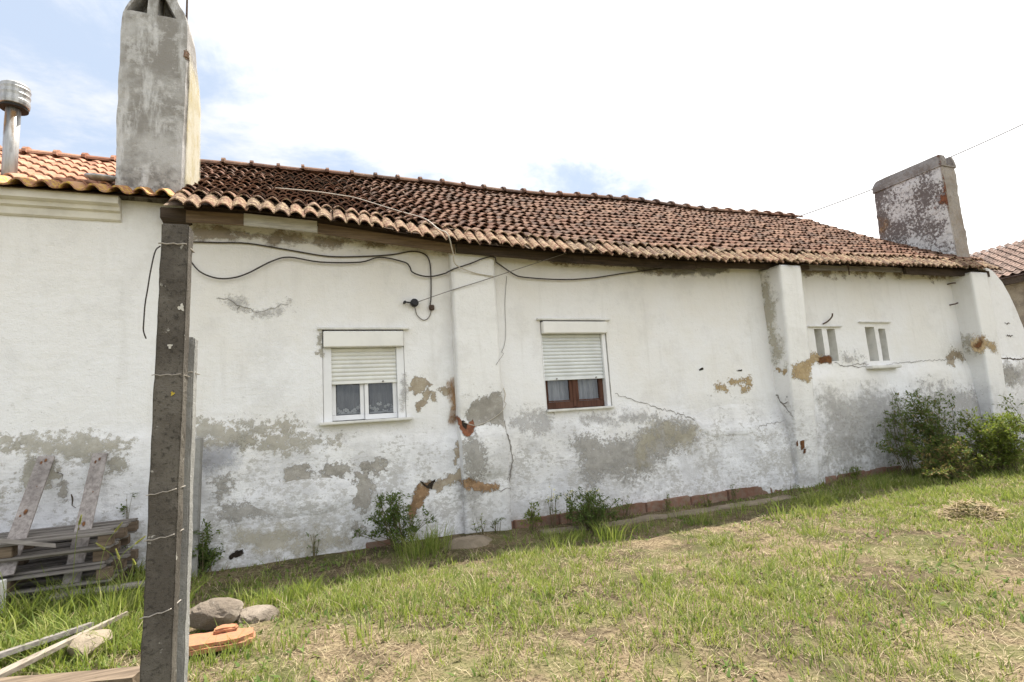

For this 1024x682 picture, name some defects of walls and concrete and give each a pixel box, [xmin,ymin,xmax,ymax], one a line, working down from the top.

leakage [762,276,783,364]
flaking render [401,374,451,412]
peeling [715,369,753,394]
peeling [775,350,833,383]
spalling [946,332,997,367]
leakage [0,427,139,502]
leakage [195,413,343,468]
flaking render [407,390,505,523]
crack [499,421,514,498]
leakage [235,525,351,558]